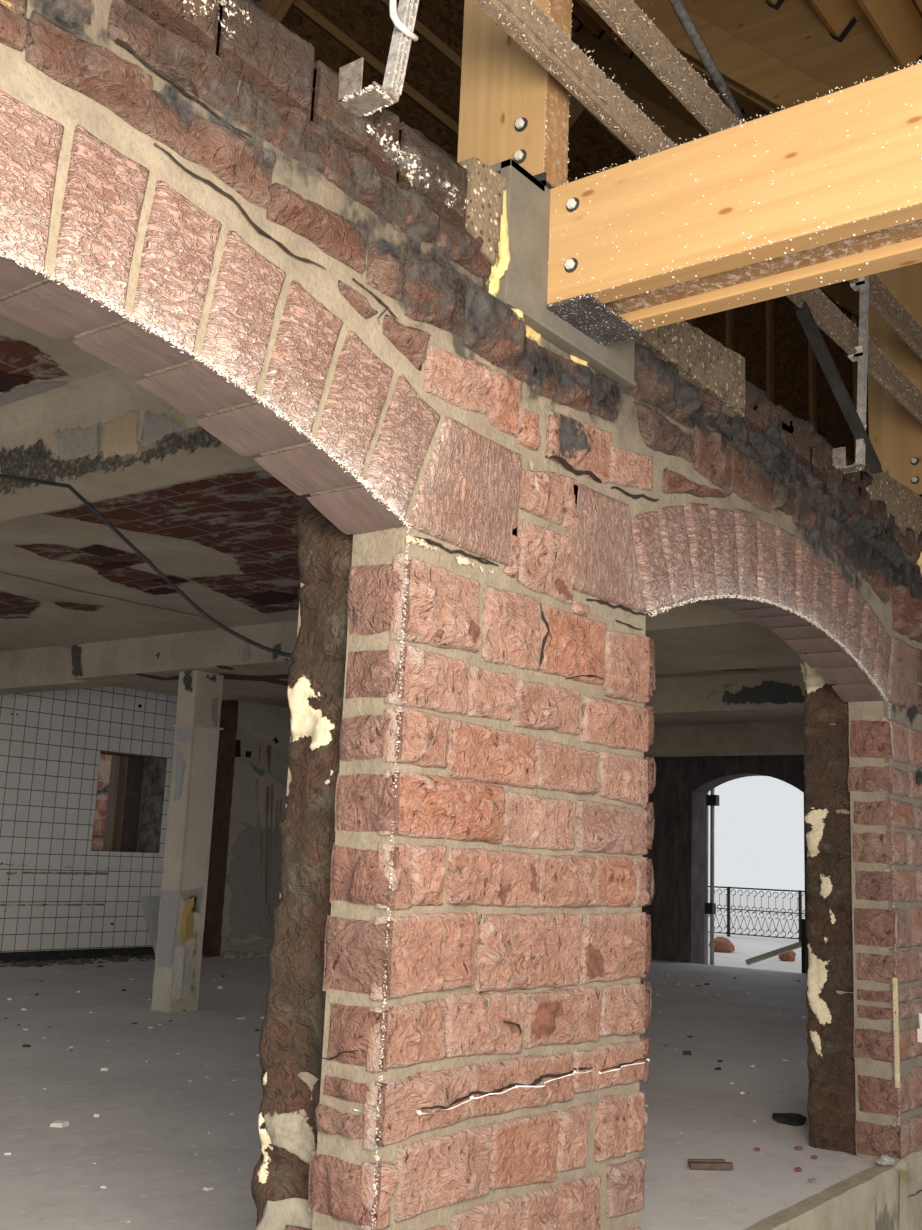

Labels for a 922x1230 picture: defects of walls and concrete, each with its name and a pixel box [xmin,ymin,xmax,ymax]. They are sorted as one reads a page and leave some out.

crack [156,144,325,269]
crack [353,278,421,330]
spalling [0,337,68,393]
spalling [15,471,302,614]
crack [540,604,604,679]
peeling [217,644,335,751]
peeling [800,661,826,694]
peeling [804,807,829,857]
peeling [820,874,836,924]
peeling [807,944,832,1056]
crack [416,1057,650,1115]
crack [875,1174,922,1228]